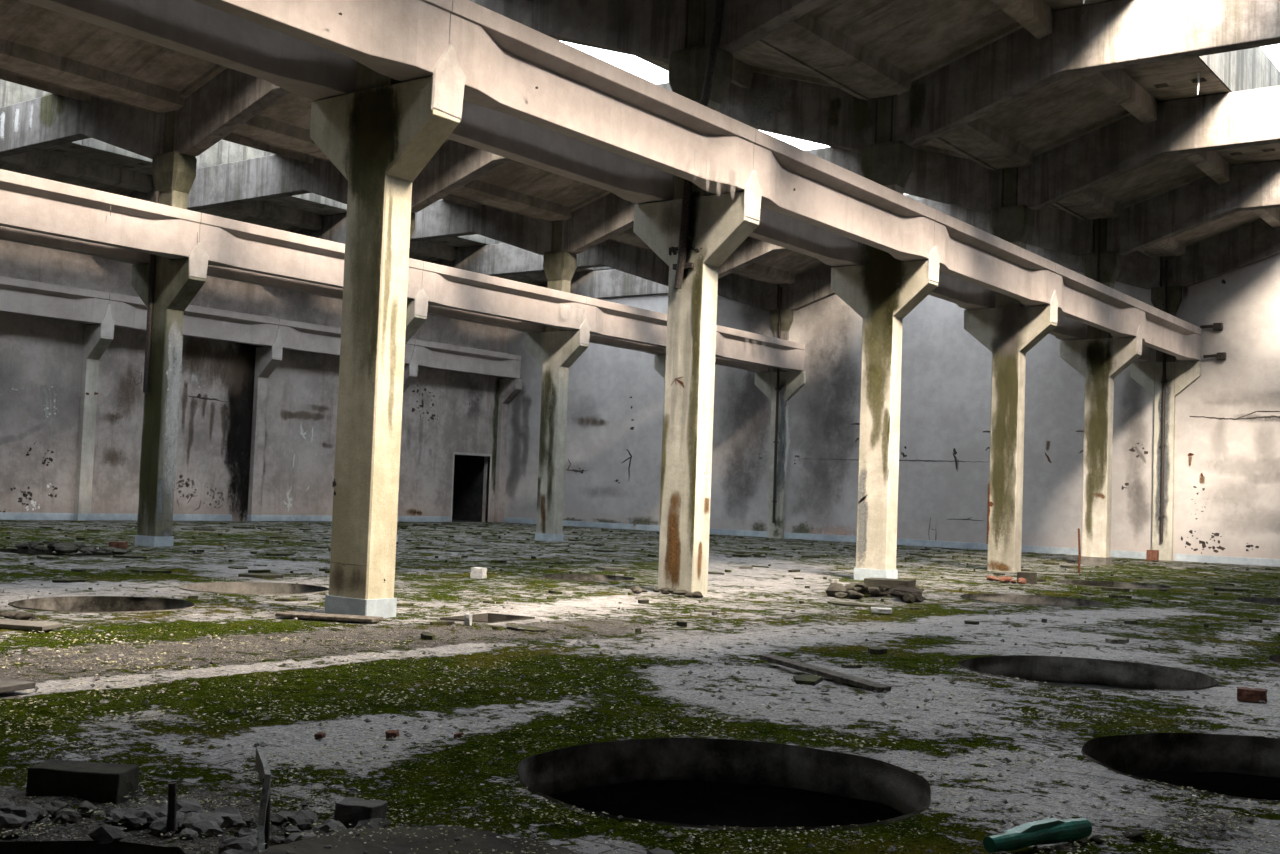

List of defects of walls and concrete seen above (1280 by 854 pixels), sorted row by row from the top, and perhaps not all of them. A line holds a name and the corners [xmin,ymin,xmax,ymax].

leakage [881,262,896,353]
leakage [181,337,261,521]
leakage [730,379,786,493]
leakage [808,366,889,498]
leakage [992,358,1018,535]
leakage [1086,393,1108,534]
leakage [1134,382,1171,527]
rust [665,493,681,584]